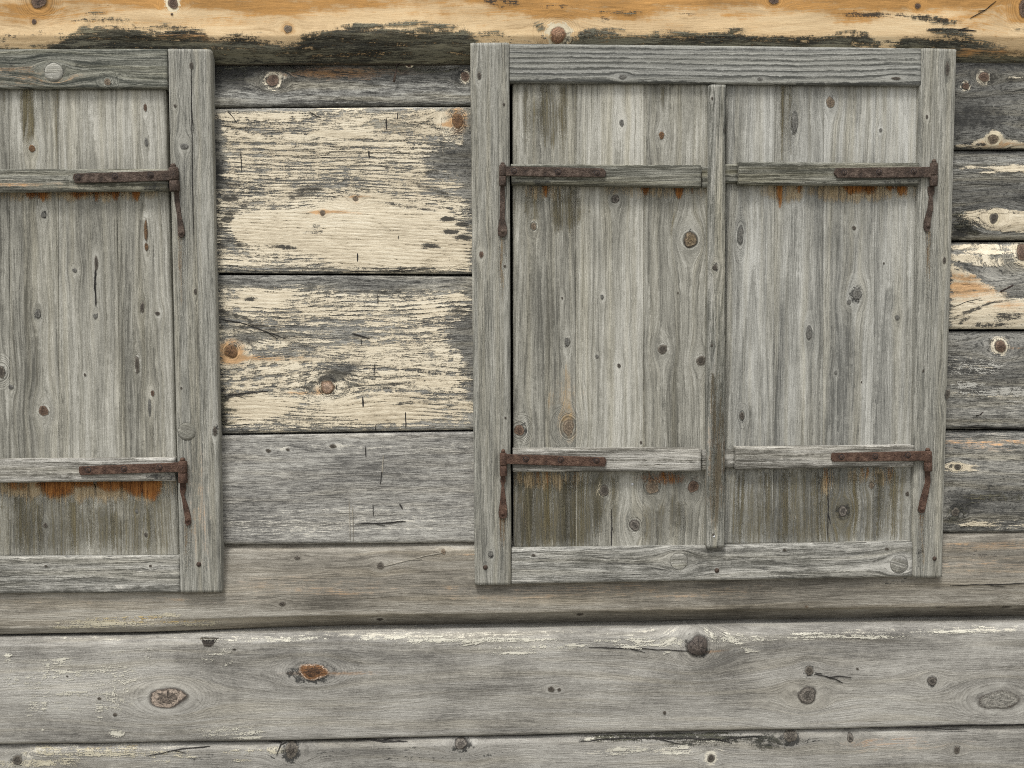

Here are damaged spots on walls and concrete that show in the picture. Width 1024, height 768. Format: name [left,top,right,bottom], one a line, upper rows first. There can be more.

peeling [956,131,1024,148]
peeling [962,164,1024,173]
rust [8,192,157,201]
peeling [215,108,472,273]
rust [624,187,687,198]
rust [763,186,916,207]
peeling [949,208,1024,329]
peeling [218,284,473,432]
peeling [947,359,1024,402]
peeling [945,461,979,473]
rust [0,481,173,503]